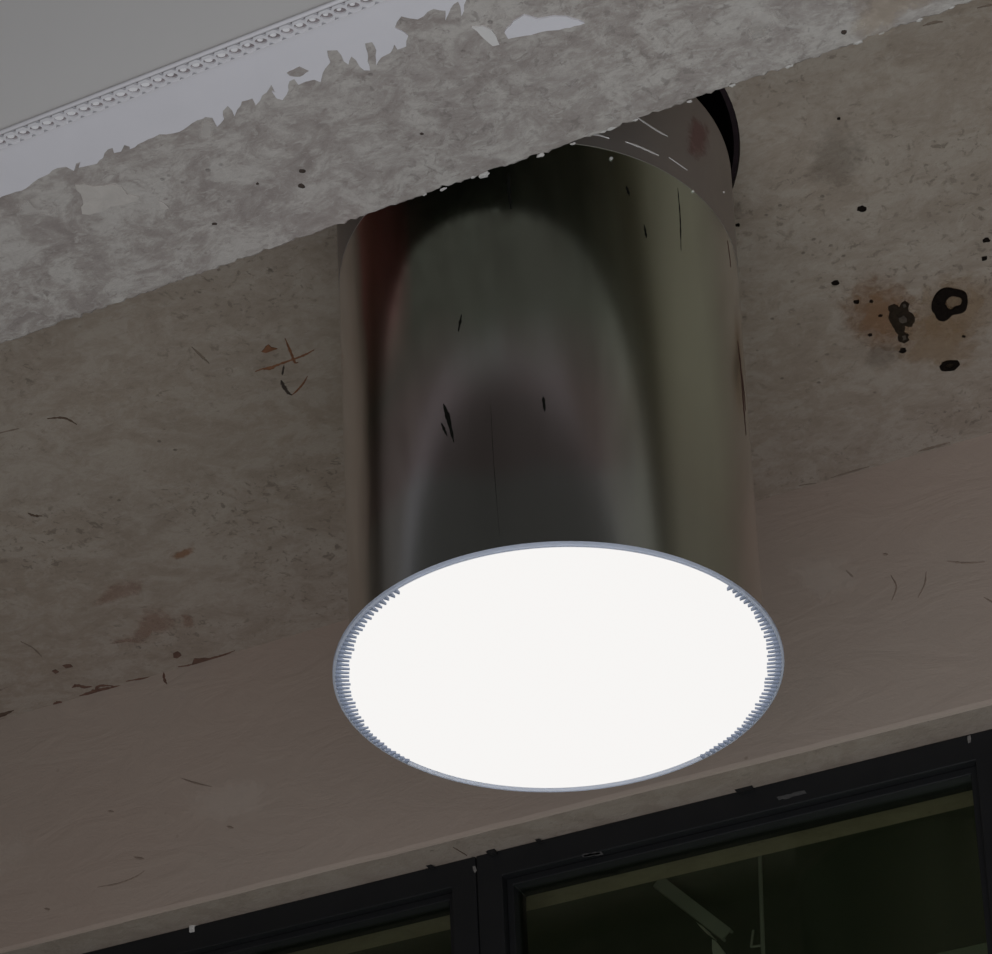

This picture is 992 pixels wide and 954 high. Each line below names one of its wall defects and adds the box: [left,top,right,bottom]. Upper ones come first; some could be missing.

peeling [472,14,585,46]
peeling [0,0,466,197]
spalling [75,183,139,215]
corrosion [855,288,906,342]